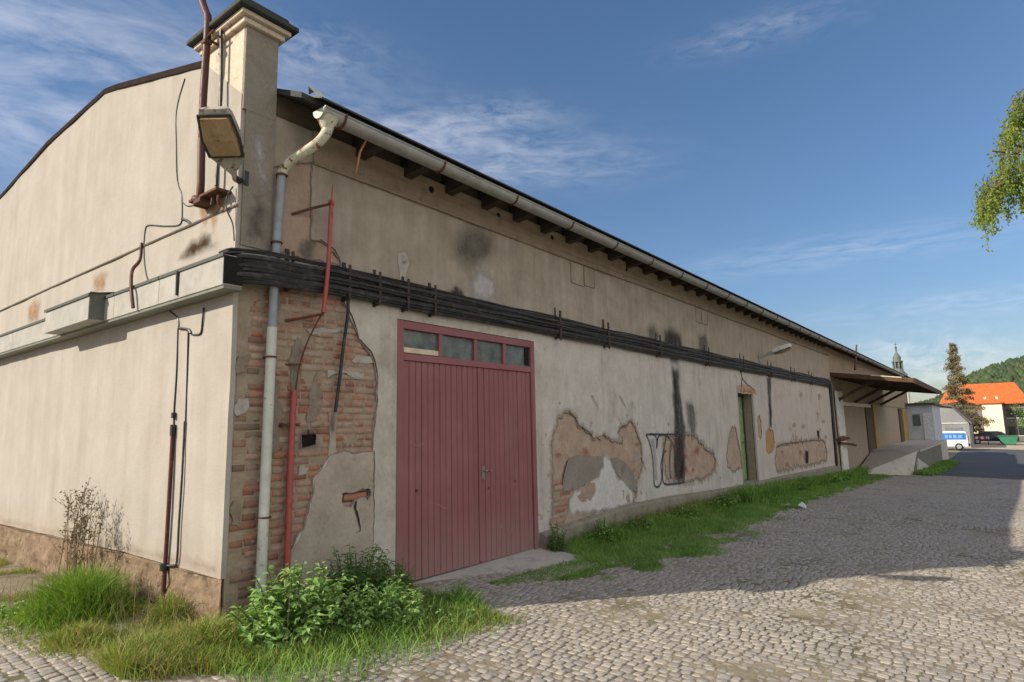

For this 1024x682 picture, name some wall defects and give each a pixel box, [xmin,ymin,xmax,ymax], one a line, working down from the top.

flaking render [226,284,379,622]
spalling [538,397,646,529]
damp [673,358,695,480]
spalling [662,422,742,488]
spalling [757,393,830,474]